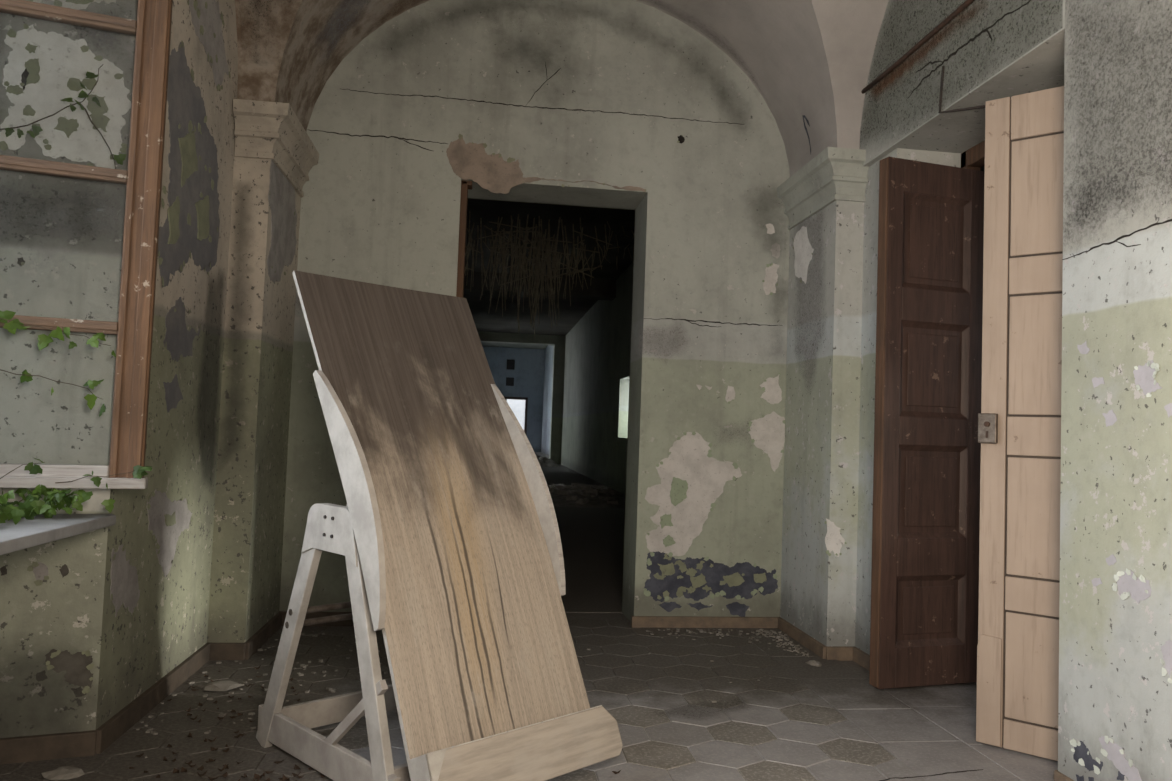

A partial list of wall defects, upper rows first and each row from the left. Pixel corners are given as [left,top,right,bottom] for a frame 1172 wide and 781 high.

peeling [187,0,231,91]
crack [907,0,1030,99]
leakage [860,0,1172,220]
peeling [158,41,220,288]
flaking render [446,134,646,194]
peeling [762,224,814,295]
crack [1062,219,1172,260]
peeling [163,297,201,413]
peeling [748,373,785,472]
peeling [643,431,778,617]
crack [879,769,983,781]
peeling [1070,736,1142,781]